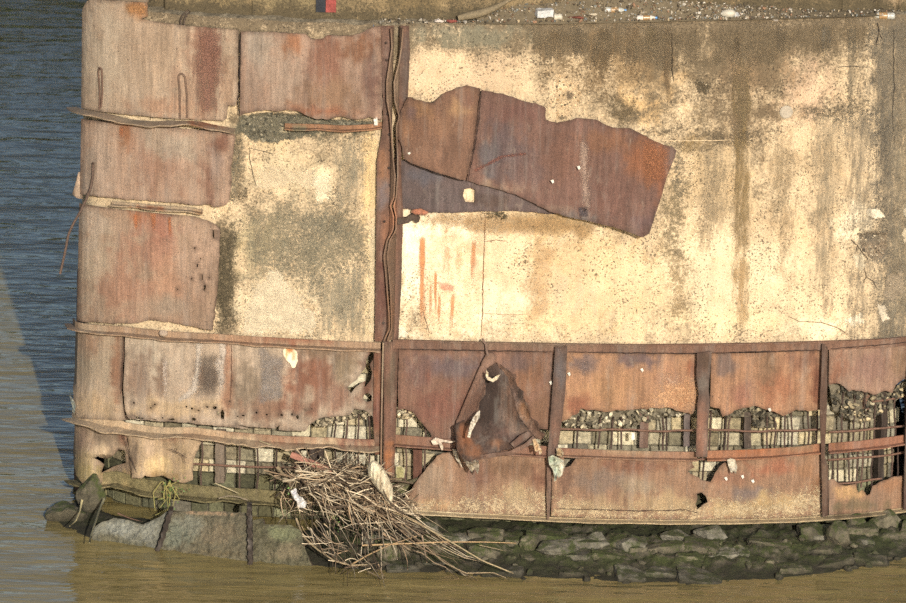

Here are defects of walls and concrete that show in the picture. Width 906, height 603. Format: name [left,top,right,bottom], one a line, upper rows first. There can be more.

rust [193,31,221,112]
damp [528,17,906,338]
damp [214,139,370,335]
rust [419,238,454,316]
spalling [311,409,372,427]
spalling [562,407,697,429]
rust [642,372,698,409]
spalling [709,406,795,428]
spalling [828,380,906,424]